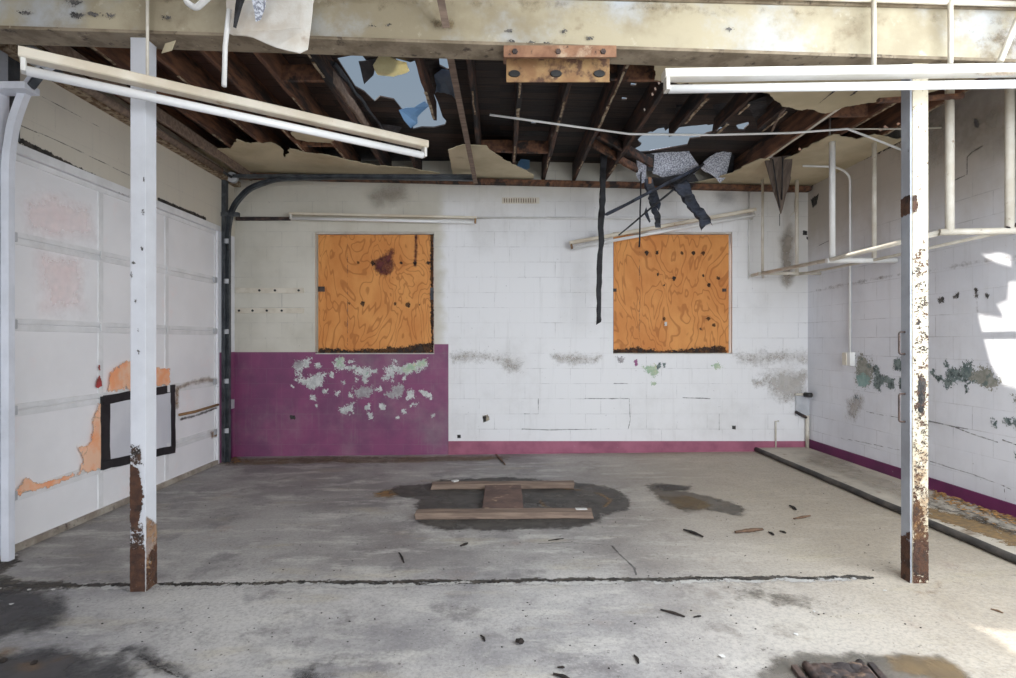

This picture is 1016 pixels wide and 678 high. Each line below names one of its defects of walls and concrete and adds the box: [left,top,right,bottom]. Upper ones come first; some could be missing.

peeling [291,357,433,421]
peeling [849,353,901,417]
peeling [930,359,1002,393]
rust [130,465,144,527]
leakage [647,484,744,515]
rust [901,476,929,583]
rust [130,543,157,592]
crack [0,544,874,594]
leakage [759,652,968,678]